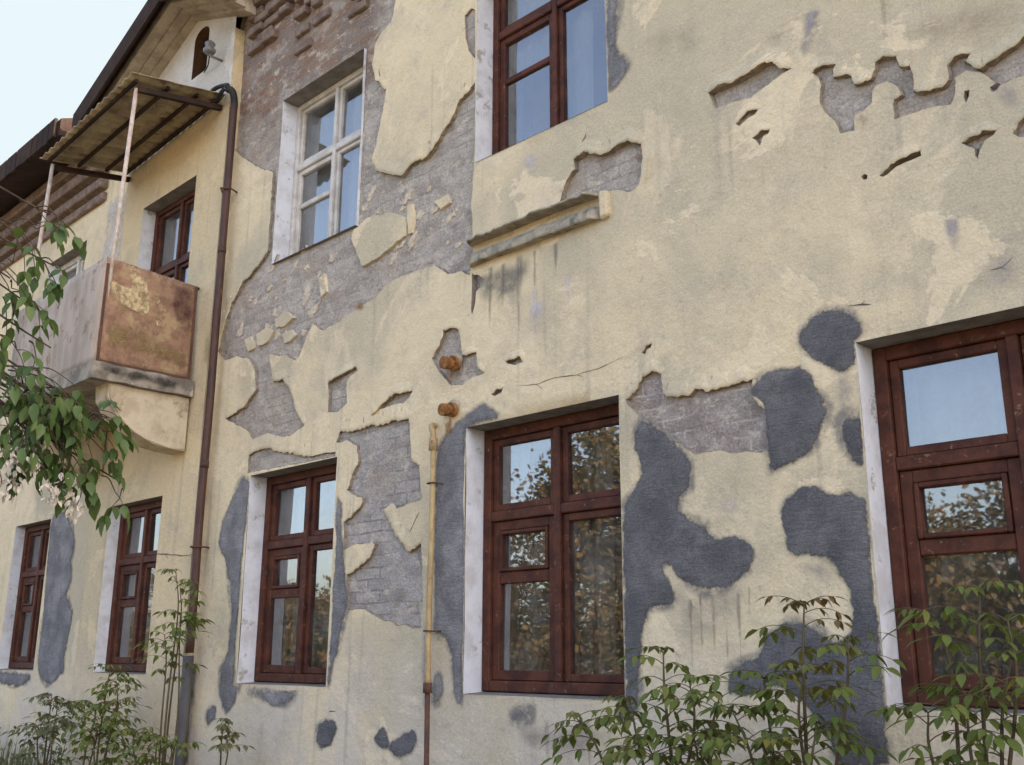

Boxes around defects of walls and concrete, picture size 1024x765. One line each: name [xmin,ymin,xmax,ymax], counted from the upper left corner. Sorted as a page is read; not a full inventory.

spalling [559,127,646,201]
spalling [703,47,792,145]
spalling [809,23,1024,133]
spalling [962,104,1024,158]
spalling [218,0,485,629]
crack [520,356,625,389]
spalling [625,339,767,455]